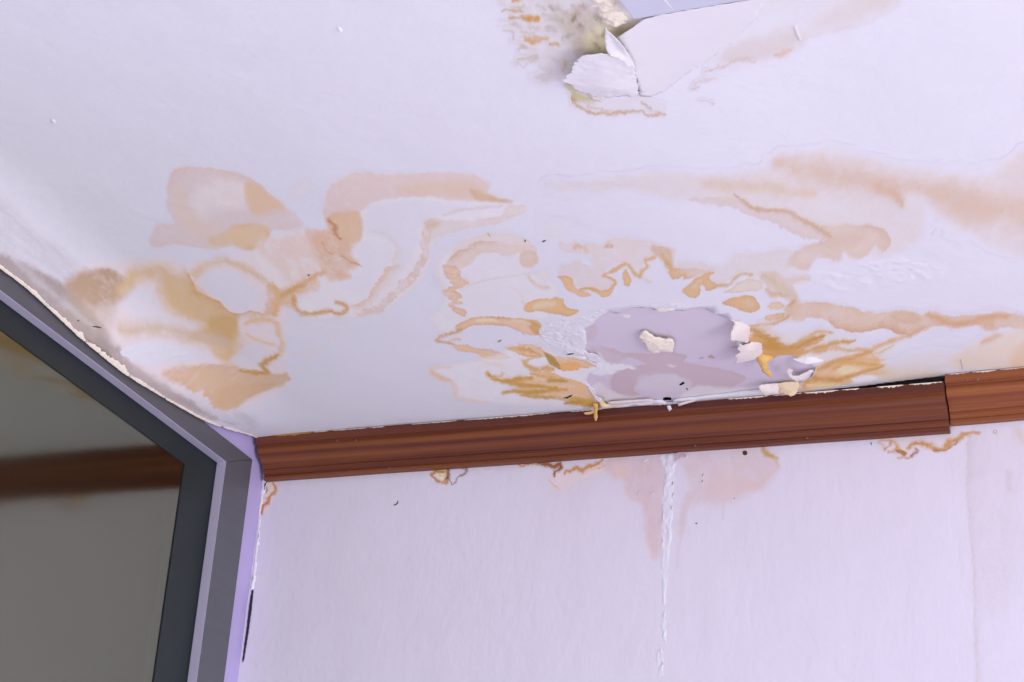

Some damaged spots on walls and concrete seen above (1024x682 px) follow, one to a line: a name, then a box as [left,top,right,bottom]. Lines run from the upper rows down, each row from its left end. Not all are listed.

damp [492,0,745,120]
peeling [561,0,766,102]
damp [688,0,903,107]
damp [0,140,1024,434]
peeling [584,307,824,421]
damp [517,446,788,571]
damp [874,421,1024,626]